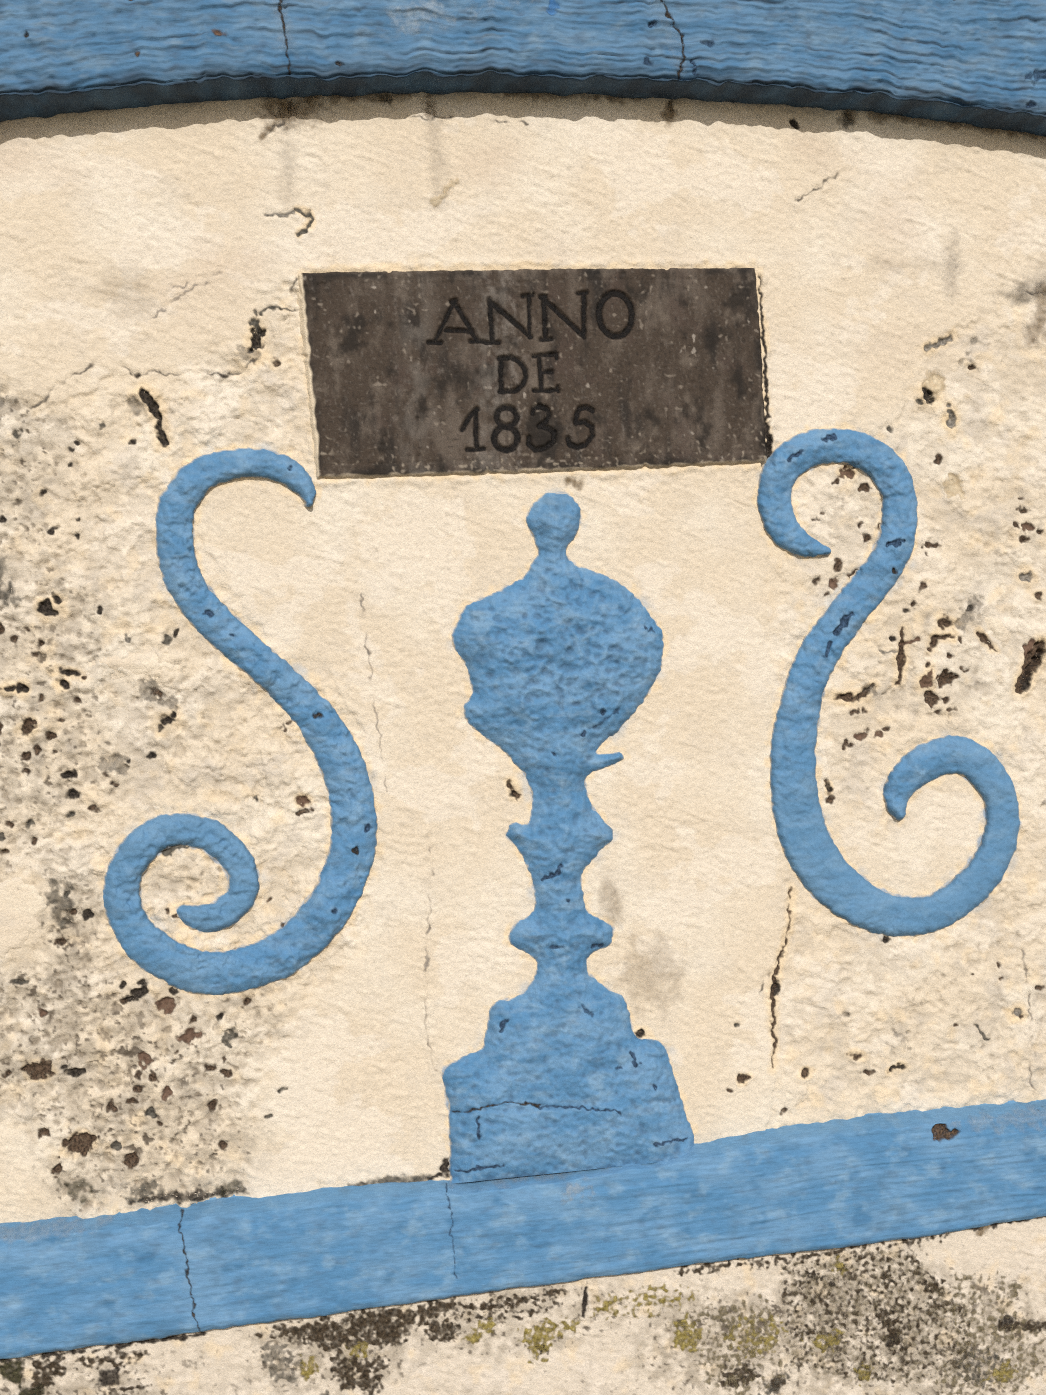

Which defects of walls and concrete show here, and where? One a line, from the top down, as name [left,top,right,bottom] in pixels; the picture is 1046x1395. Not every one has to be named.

crack [661,0,698,79]
spalling [128,373,169,447]
leakage [0,562,21,605]
spalling [919,603,980,714]
spalling [1015,639,1046,694]
spalling [836,683,890,750]
mould [47,879,73,928]
crack [761,889,792,1068]
mould [126,1181,246,1205]
crack [446,1101,621,1275]
crack [178,1209,199,1328]
leakage [0,1332,206,1362]